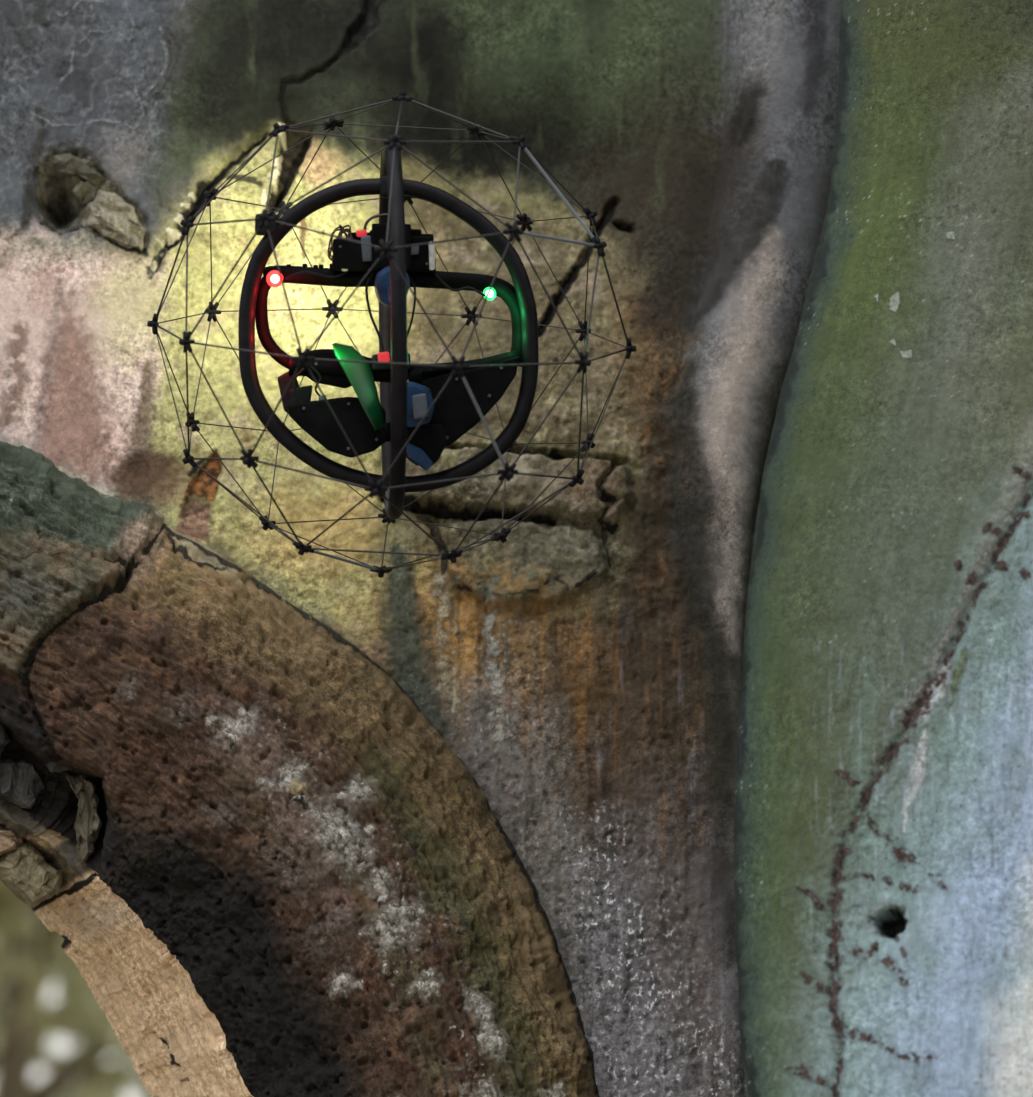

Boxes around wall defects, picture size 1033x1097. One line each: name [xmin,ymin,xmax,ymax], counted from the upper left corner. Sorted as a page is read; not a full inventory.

peeling [14,26,181,130]
spalling [36,139,149,256]
crack [147,0,386,280]
crack [538,197,617,336]
crack [510,449,567,461]
crack [382,494,555,575]
crack [597,461,622,567]
crack [18,523,431,757]
crack [460,759,600,1097]